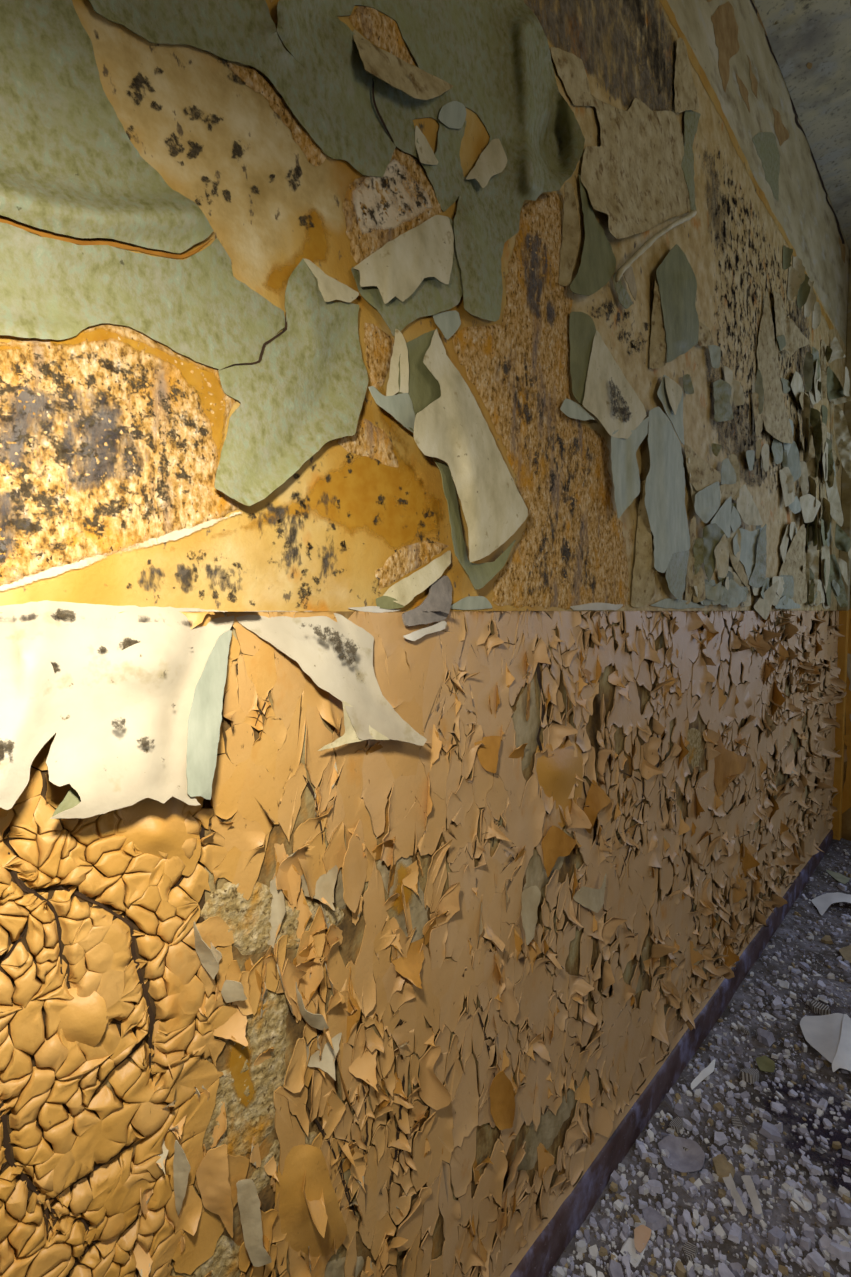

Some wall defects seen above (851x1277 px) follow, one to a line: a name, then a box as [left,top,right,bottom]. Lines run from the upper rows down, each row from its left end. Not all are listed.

peeling [0,0,701,591]
leakage [525,0,813,494]
peeling [706,0,758,112]
peeling [752,107,789,202]
leakage [0,329,226,562]
peeling [452,193,851,1115]
crack [0,832,155,1090]
crack [200,806,227,840]
peeling [0,540,627,1277]
crack [0,1100,139,1277]